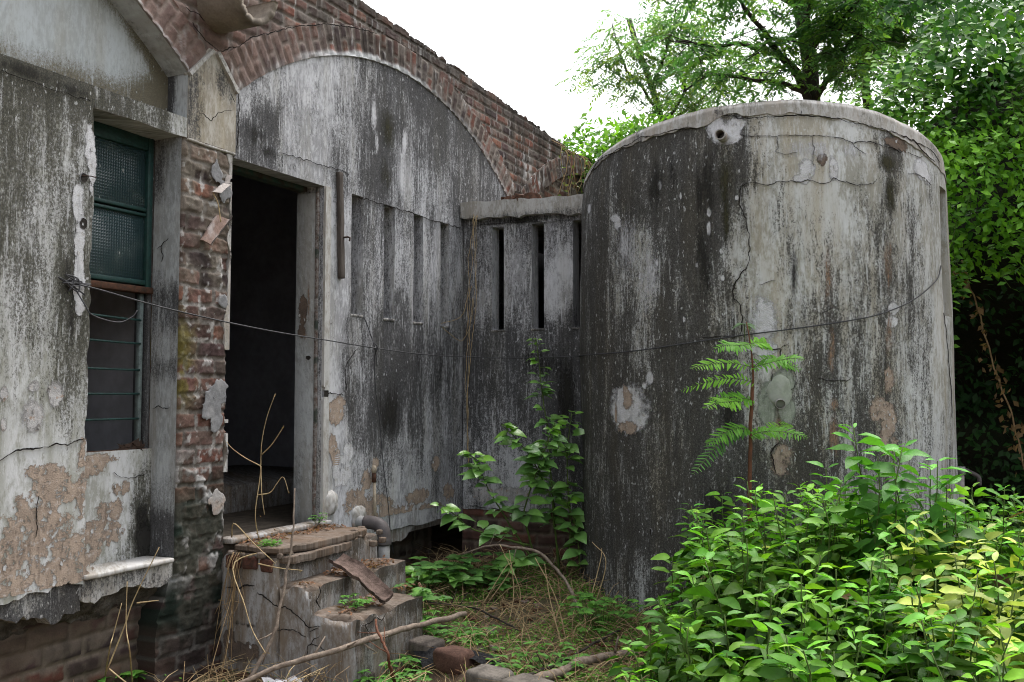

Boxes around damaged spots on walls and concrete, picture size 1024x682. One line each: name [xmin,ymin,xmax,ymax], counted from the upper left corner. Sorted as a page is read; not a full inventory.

crack [200,94,240,147]
leakage [252,82,318,157]
leakage [371,102,407,199]
spalling [707,117,747,145]
leakage [880,153,894,211]
crack [702,111,940,389]
spalling [611,371,653,436]
crack [0,439,83,461]
peeling [0,437,130,598]
leakage [704,486,730,543]
flaking render [58,586,158,624]
crack [226,584,325,654]